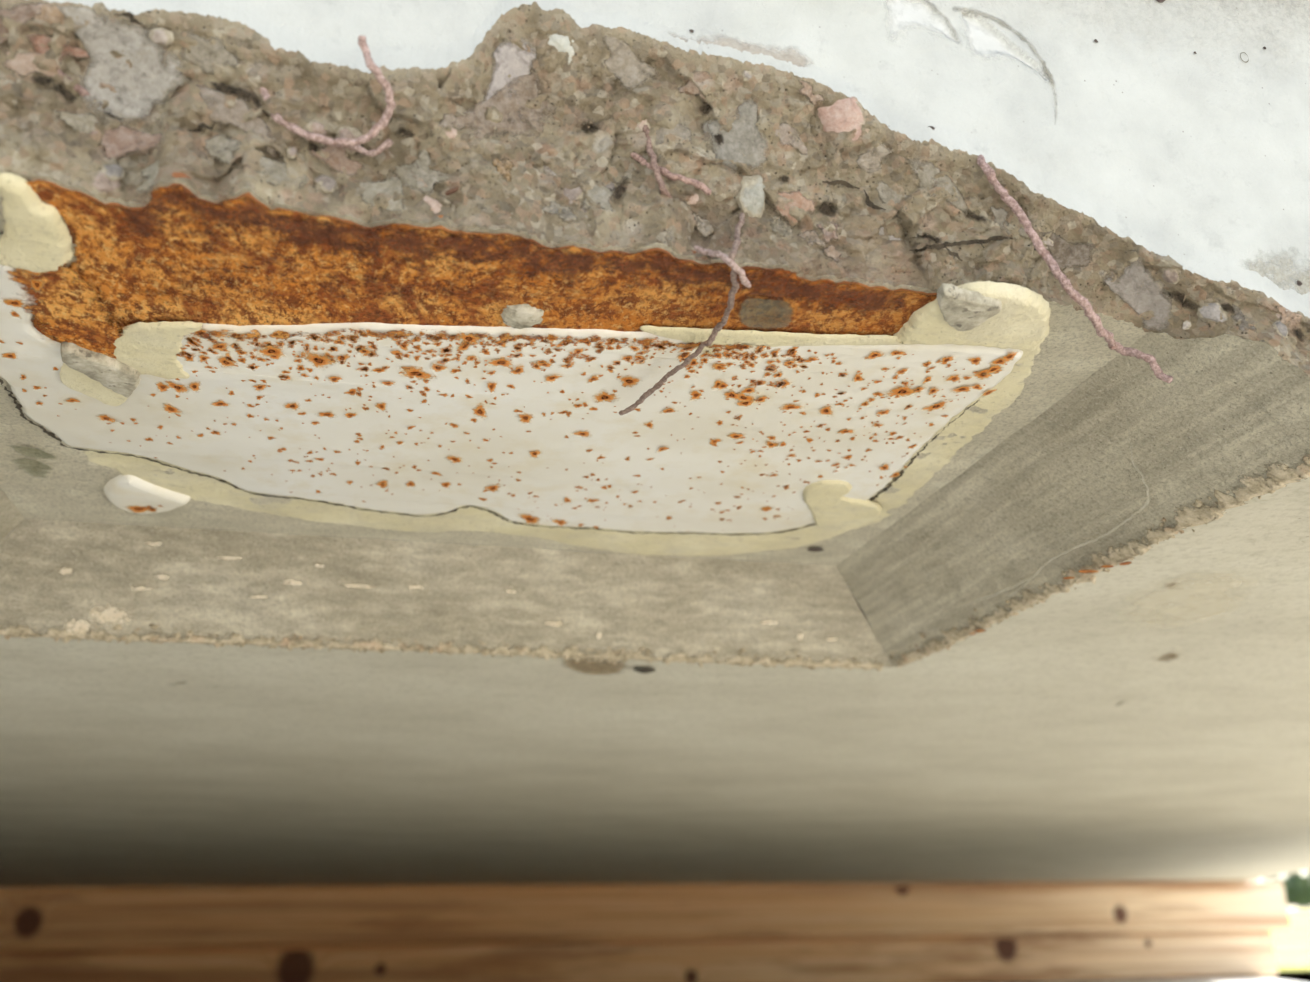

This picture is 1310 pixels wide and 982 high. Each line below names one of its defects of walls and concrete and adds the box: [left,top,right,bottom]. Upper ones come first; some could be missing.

rust [2,181,1018,529]
peeling [0,265,1023,533]
spalling [0,0,1310,378]
spalling [0,454,1310,675]